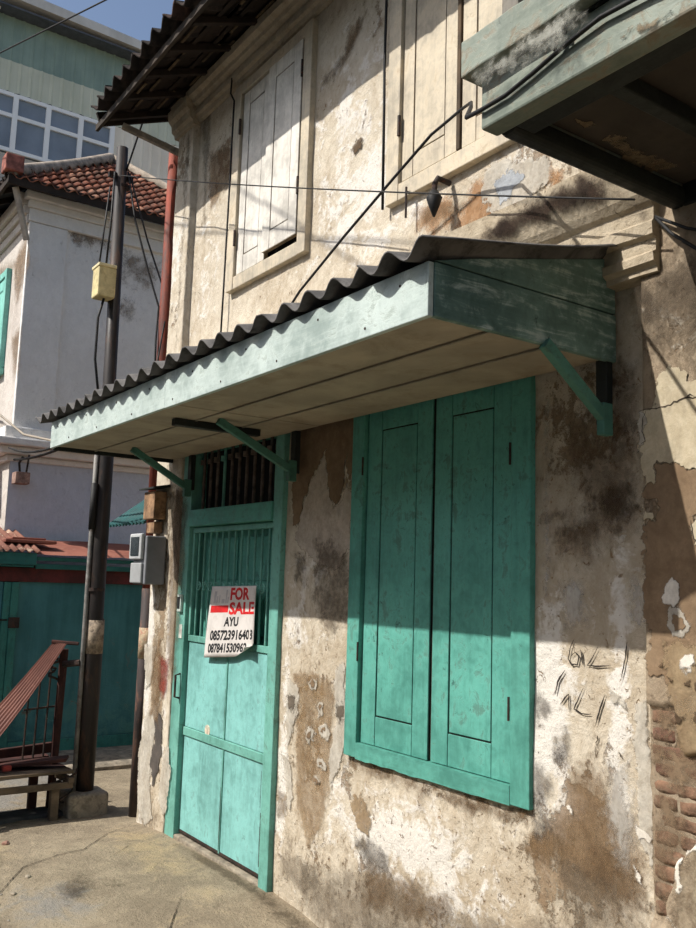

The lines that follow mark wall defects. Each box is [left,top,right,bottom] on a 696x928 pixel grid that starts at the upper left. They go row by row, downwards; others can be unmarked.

damp [482,175,605,239]
peeling [292,418,354,526]
crack [640,394,696,443]
peeling [637,365,696,691]
peeling [144,644,157,688]
peeling [137,706,171,825]
peeling [282,662,345,840]
damp [350,793,388,903]
damp [534,767,550,810]
damp [566,767,638,910]
flaking render [609,690,696,928]